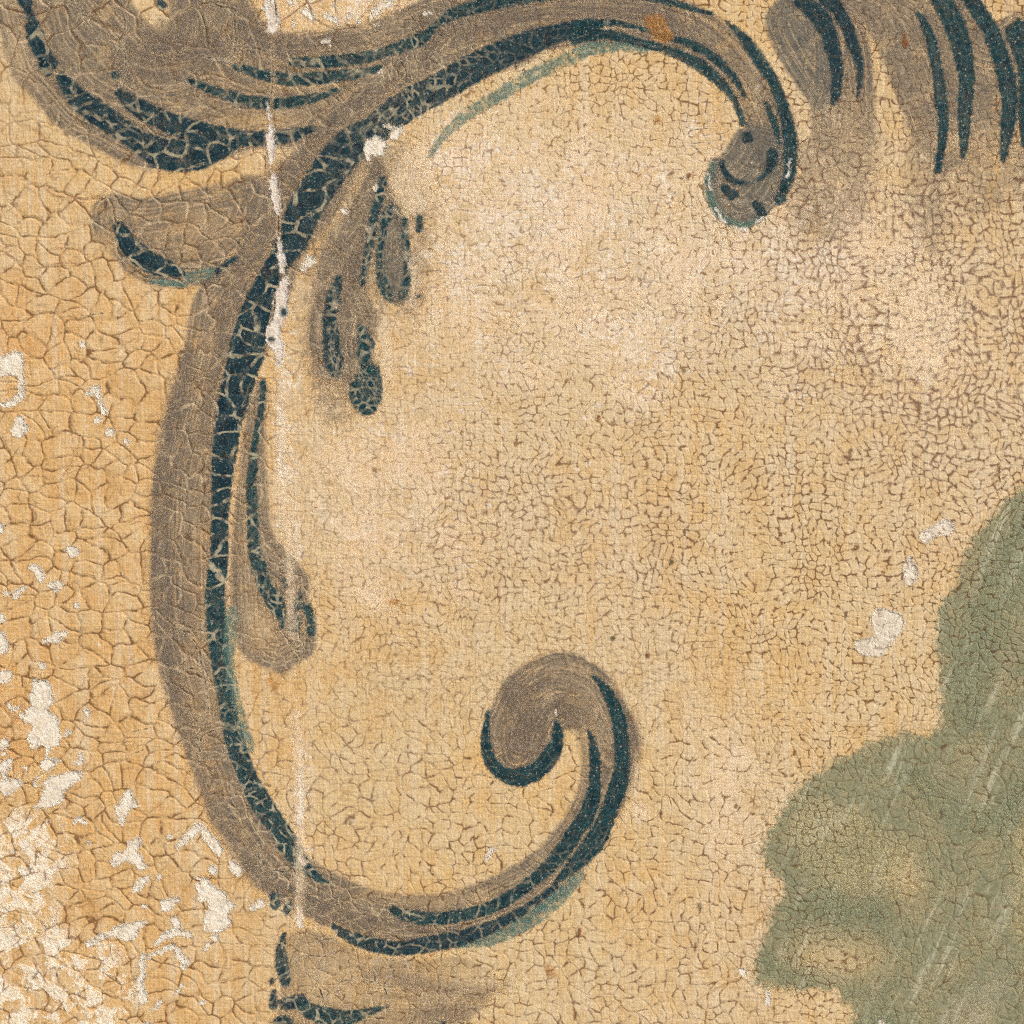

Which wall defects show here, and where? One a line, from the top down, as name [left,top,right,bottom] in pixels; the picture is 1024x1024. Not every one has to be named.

crack [207,0,290,368]
peeling [0,350,29,439]
crack [277,406,285,475]
peeling [919,518,955,543]
peeling [2,563,64,599]
peeling [42,631,68,644]
peeling [855,607,905,657]
crack [181,629,220,757]
crack [296,768,305,828]
peeling [0,662,266,1024]
crack [258,842,308,875]
crack [296,907,336,957]